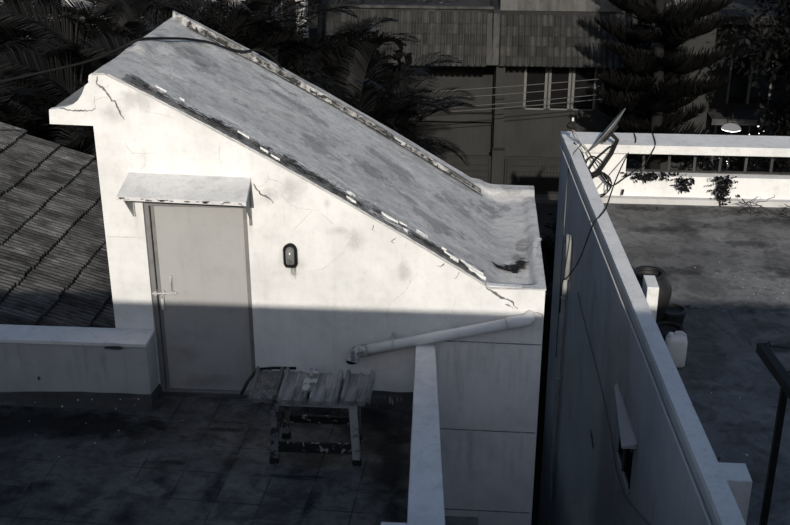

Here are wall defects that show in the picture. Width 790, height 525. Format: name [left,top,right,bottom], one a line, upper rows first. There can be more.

crack [60,76,172,120]
peeling [108,21,520,299]
crack [253,172,374,271]
peeling [527,237,541,276]